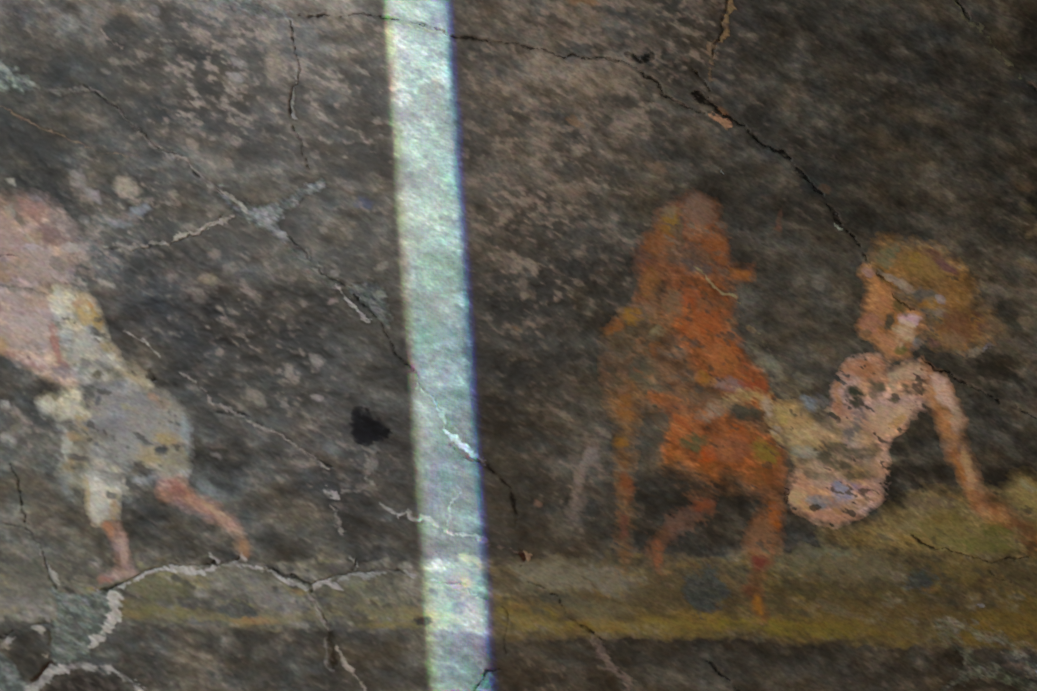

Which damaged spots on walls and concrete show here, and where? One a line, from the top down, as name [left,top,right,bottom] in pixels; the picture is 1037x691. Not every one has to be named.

crack [27,81,249,252]
crack [289,0,915,310]
crack [123,329,332,470]
crack [922,358,1037,420]
crack [0,614,57,683]
crack [0,463,61,589]
flaking render [24,660,146,691]
flaking render [87,586,124,649]
crack [99,551,509,691]
crack [287,235,641,691]
crack [911,535,1033,583]